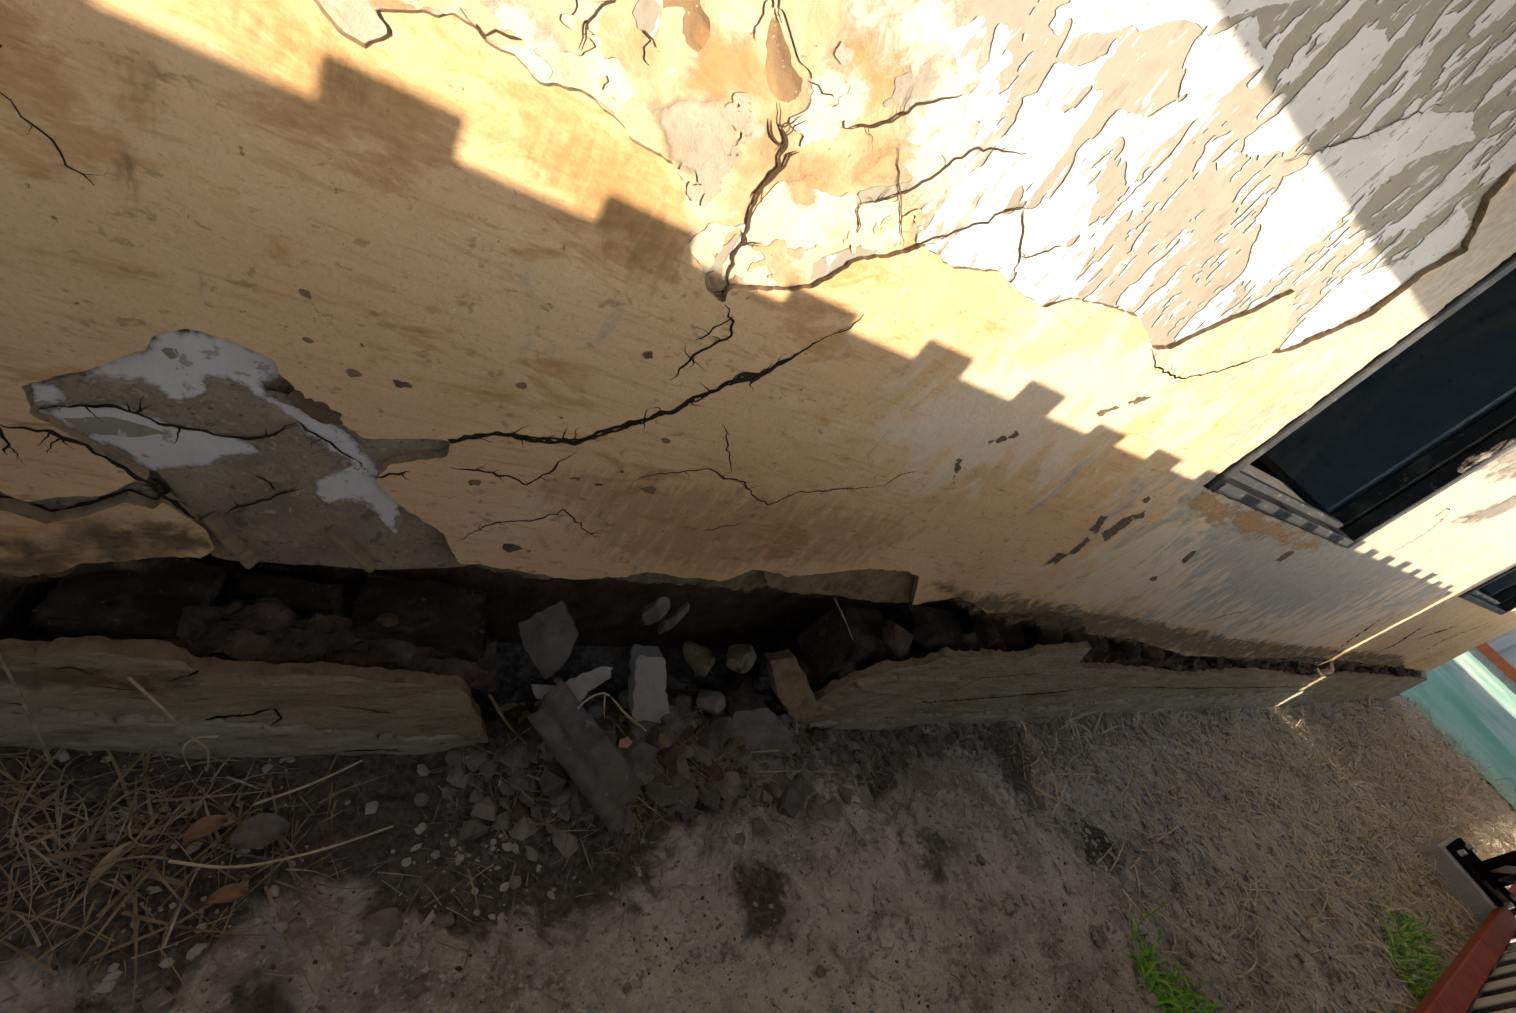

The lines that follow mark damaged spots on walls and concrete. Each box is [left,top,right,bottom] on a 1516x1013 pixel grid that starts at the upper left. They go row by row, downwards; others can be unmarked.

crack [0,92,109,185]
peeling [318,0,1516,349]
crack [448,82,1064,541]
flaking render [28,330,553,580]
crack [922,672,1304,703]